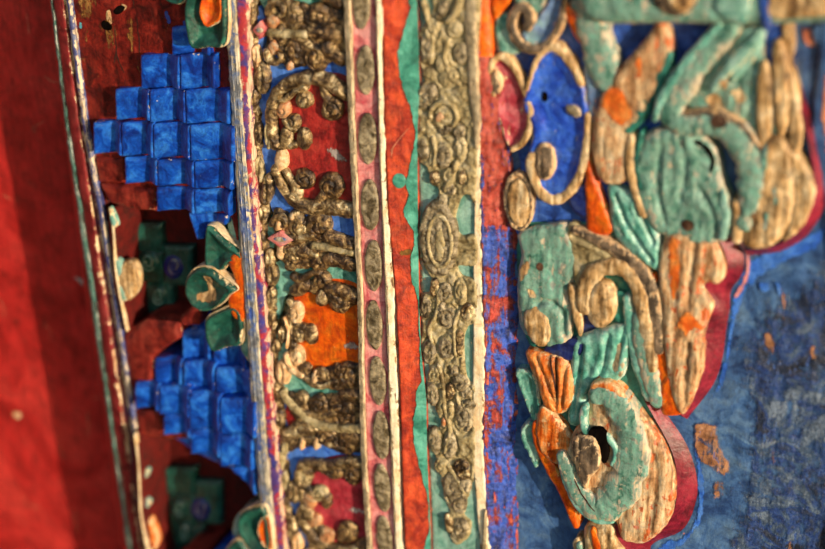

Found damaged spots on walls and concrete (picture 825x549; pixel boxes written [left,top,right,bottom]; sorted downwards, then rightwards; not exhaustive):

peeling [78,0,96,29]
peeling [100,4,127,48]
peeling [600,87,632,126]
peeling [658,229,825,549]